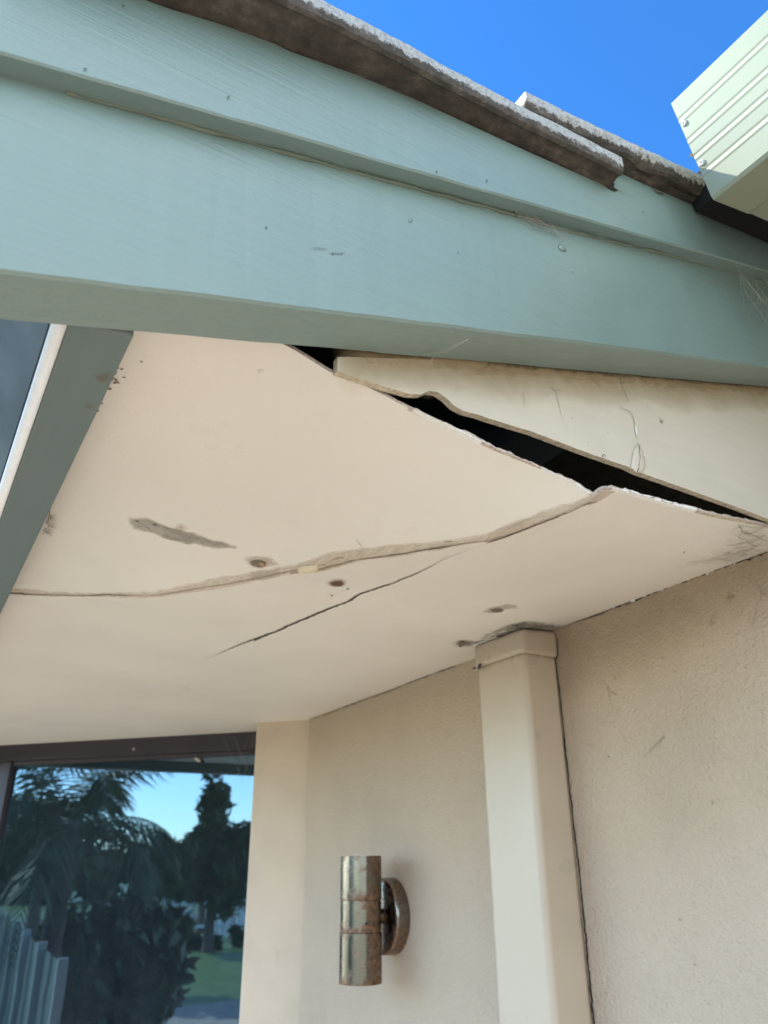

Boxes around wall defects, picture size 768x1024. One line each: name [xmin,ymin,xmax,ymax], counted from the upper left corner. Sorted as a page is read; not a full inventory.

crack [10,502,597,652]